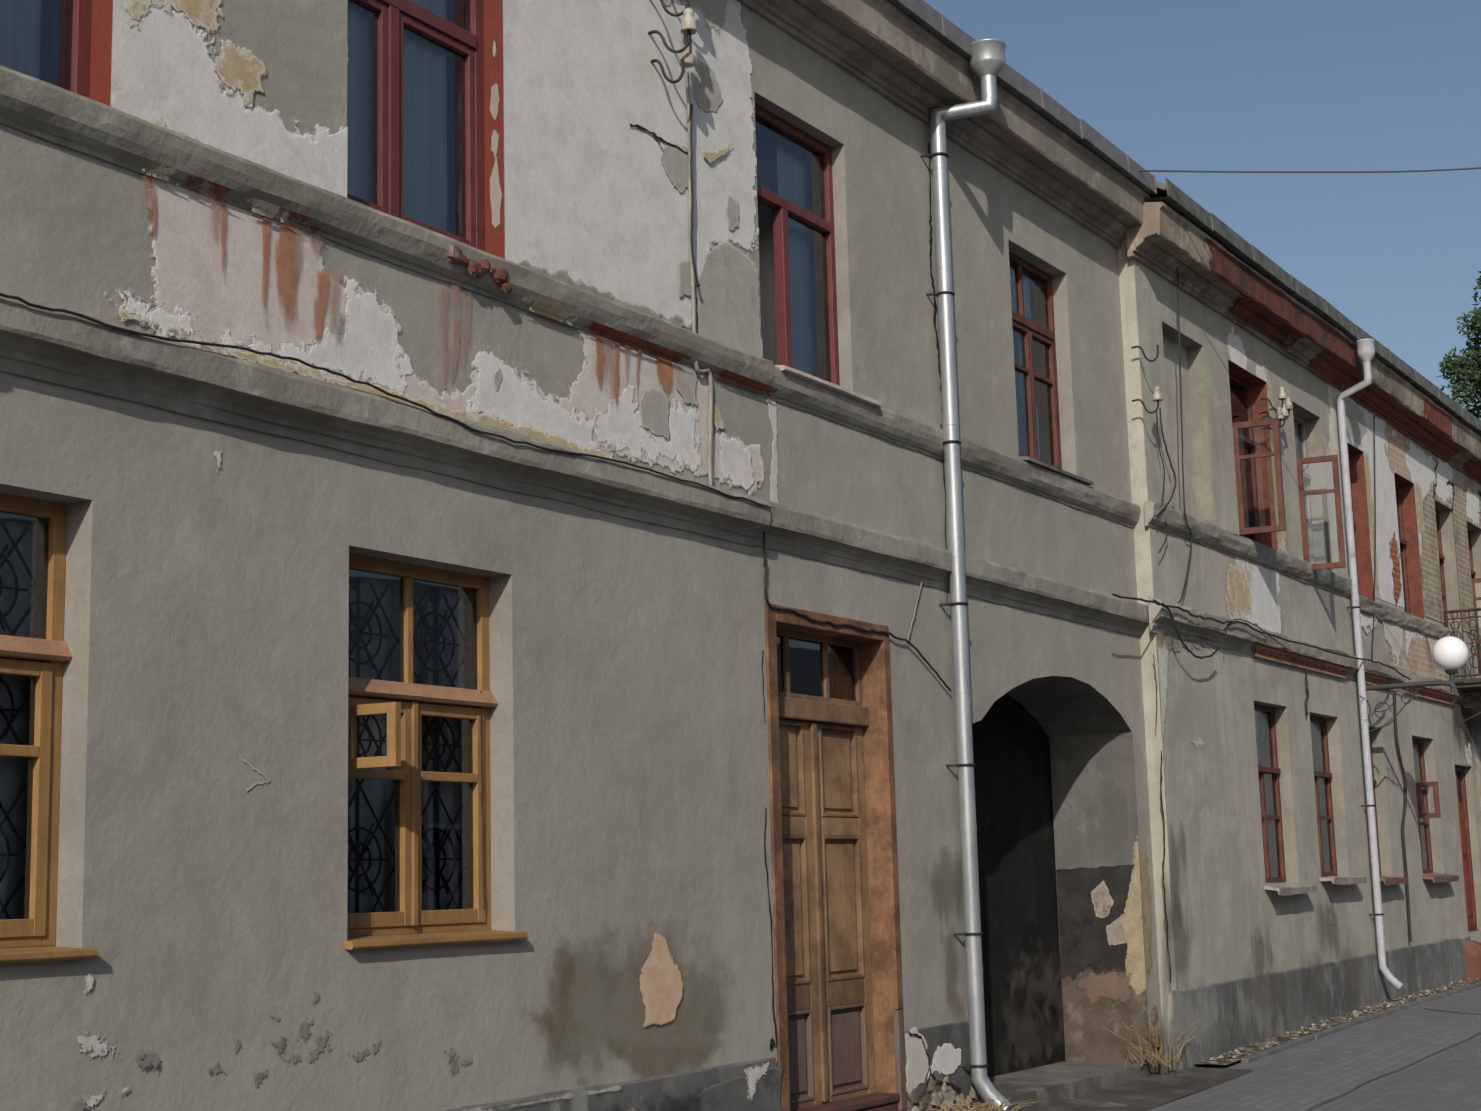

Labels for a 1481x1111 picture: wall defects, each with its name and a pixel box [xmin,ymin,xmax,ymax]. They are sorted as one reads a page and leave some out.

rust [212,195,226,268]
rust [262,216,320,319]
rust [314,269,339,340]
peeling [105,0,779,503]
peeling [1203,238,1481,705]
flaking render [83,973,94,993]
flaking render [77,1032,159,1073]
flaking render [254,993,381,1088]
peeling [639,933,684,1028]
flaking render [627,1061,782,1111]
peeling [905,1027,989,1111]
damp [1003,951,1065,1072]